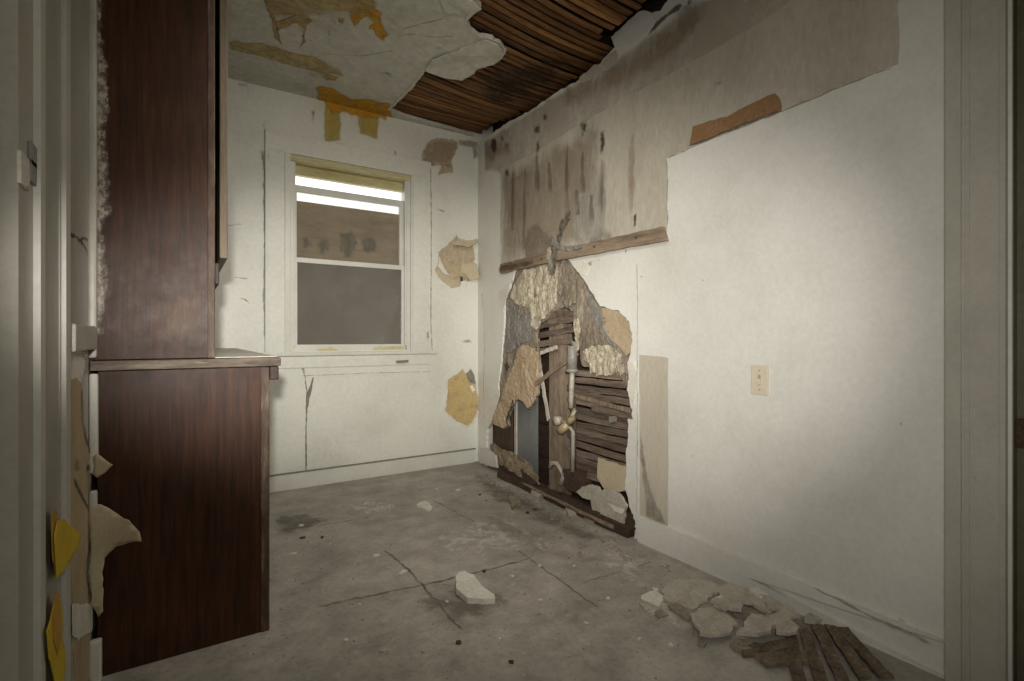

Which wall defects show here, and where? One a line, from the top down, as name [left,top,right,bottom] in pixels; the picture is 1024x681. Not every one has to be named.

peeling [264,0,313,47]
spalling [388,0,656,175]
leakage [461,0,765,257]
peeling [435,235,479,288]
spalling [491,260,637,430]
crack [302,368,395,466]
spalling [444,369,478,428]
crack [333,529,516,603]